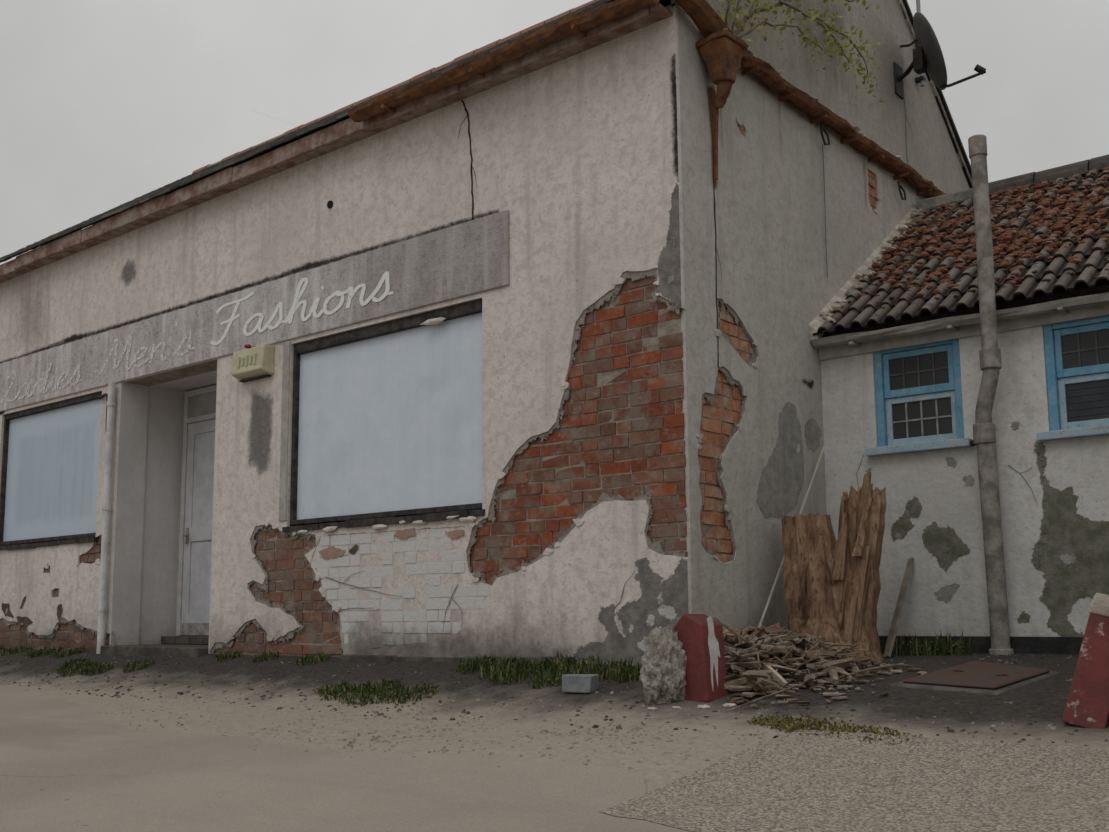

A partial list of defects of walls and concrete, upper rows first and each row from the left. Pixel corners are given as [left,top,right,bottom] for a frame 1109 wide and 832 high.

crack [458,99,477,218]
flaking render [868,171,882,214]
water stain [0,211,498,364]
flaking render [714,299,758,368]
water stain [250,394,272,471]
flaking render [210,180,749,665]
flaking render [76,536,110,566]
peeling [891,497,970,603]
peeling [1031,441,1109,637]
flaking render [0,587,114,651]
peeling [1017,611,1030,623]